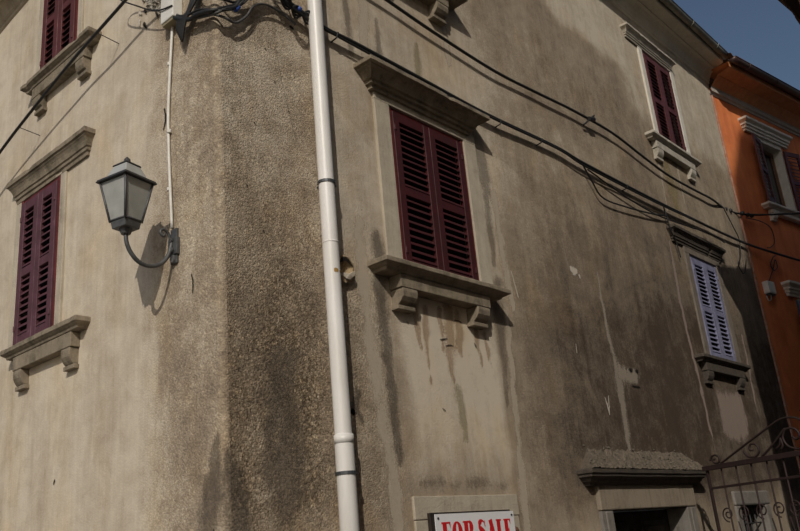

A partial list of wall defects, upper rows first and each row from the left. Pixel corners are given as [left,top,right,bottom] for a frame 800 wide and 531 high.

leakage [353,215,408,531]